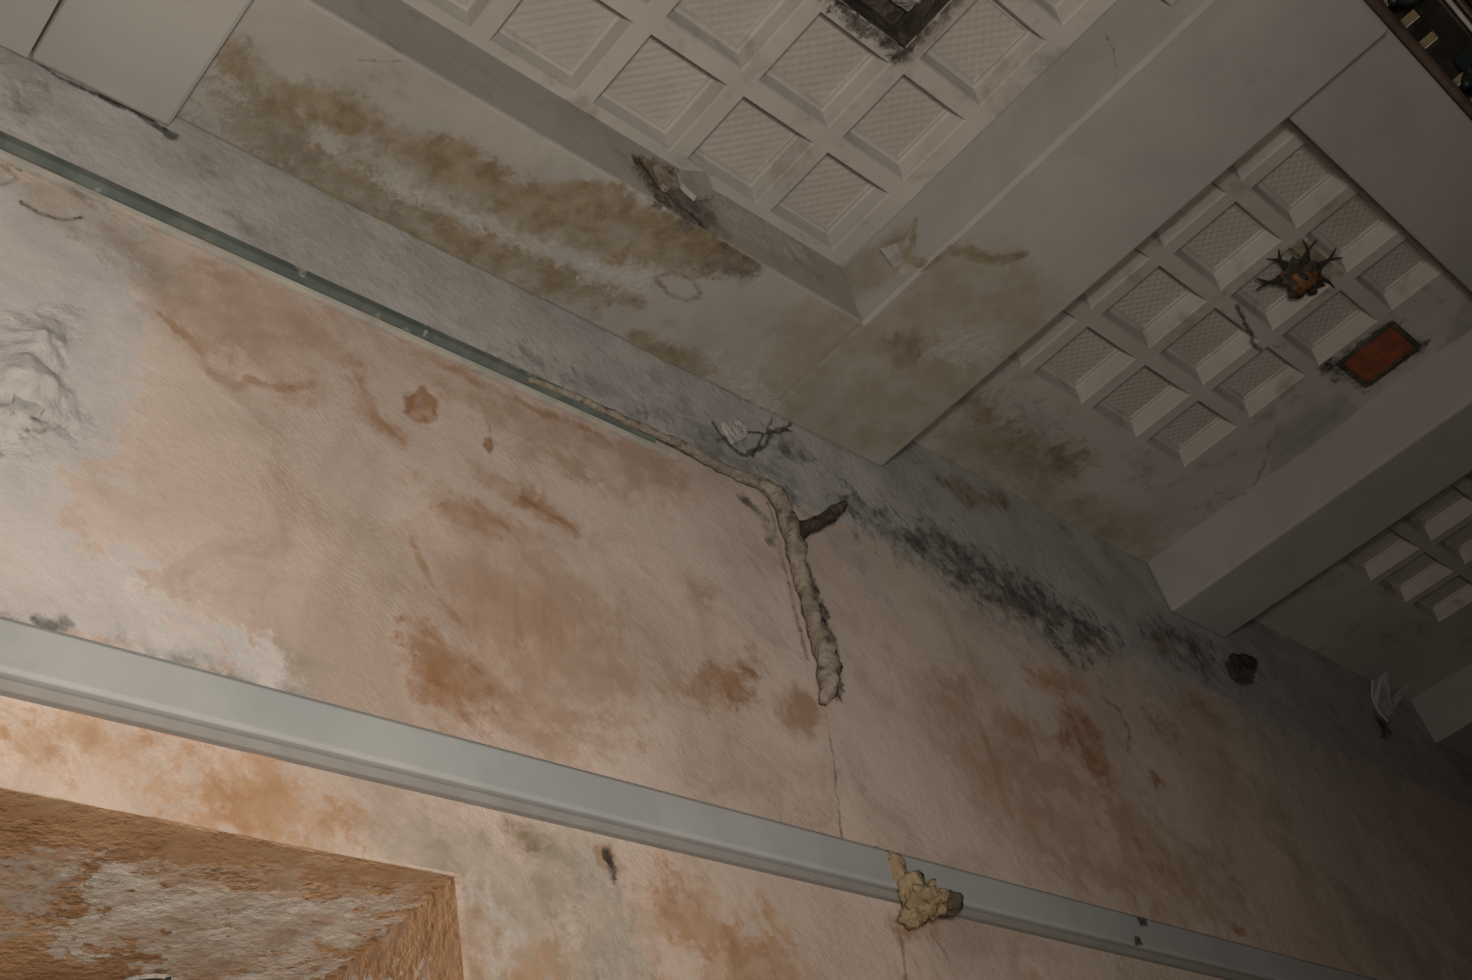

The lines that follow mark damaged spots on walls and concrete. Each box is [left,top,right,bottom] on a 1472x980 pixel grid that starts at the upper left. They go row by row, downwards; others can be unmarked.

spalling [827,0,962,63]
water stain [240,84,750,309]
spalling [633,154,815,299]
water stain [160,271,334,406]
water stain [629,233,1138,543]
water stain [31,616,73,630]
water stain [838,492,1124,666]
water stain [10,794,73,822]
water stain [164,754,454,896]
peeling [44,848,432,980]